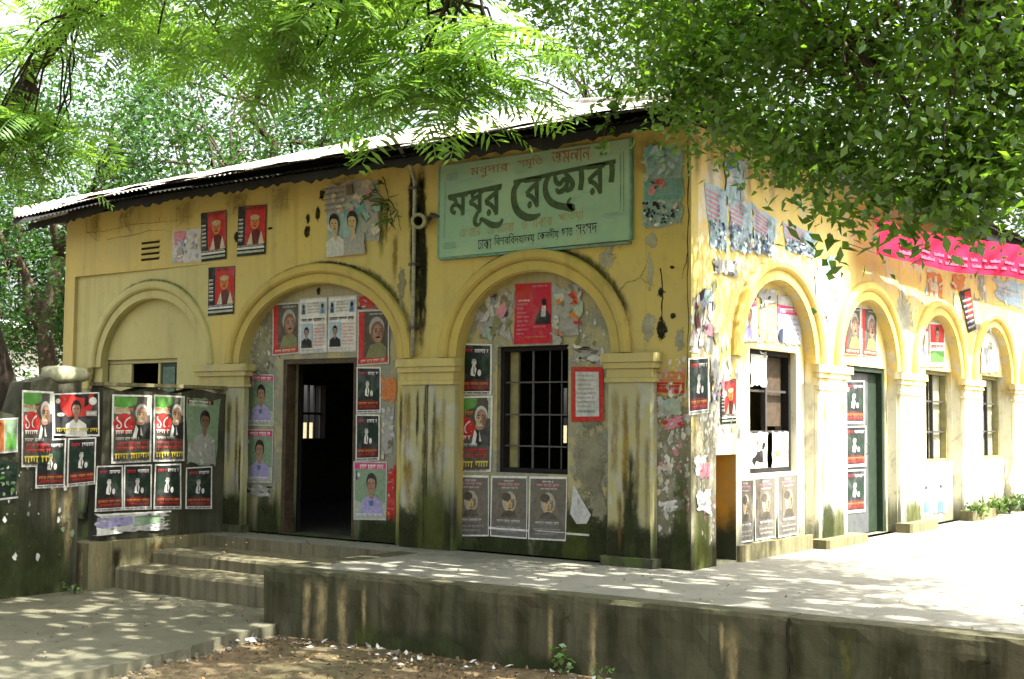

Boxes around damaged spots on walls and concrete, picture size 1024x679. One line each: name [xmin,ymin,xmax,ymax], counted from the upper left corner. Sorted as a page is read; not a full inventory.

leakage [408,177,427,333]
leakage [399,394,444,492]
leakage [51,487,73,548]